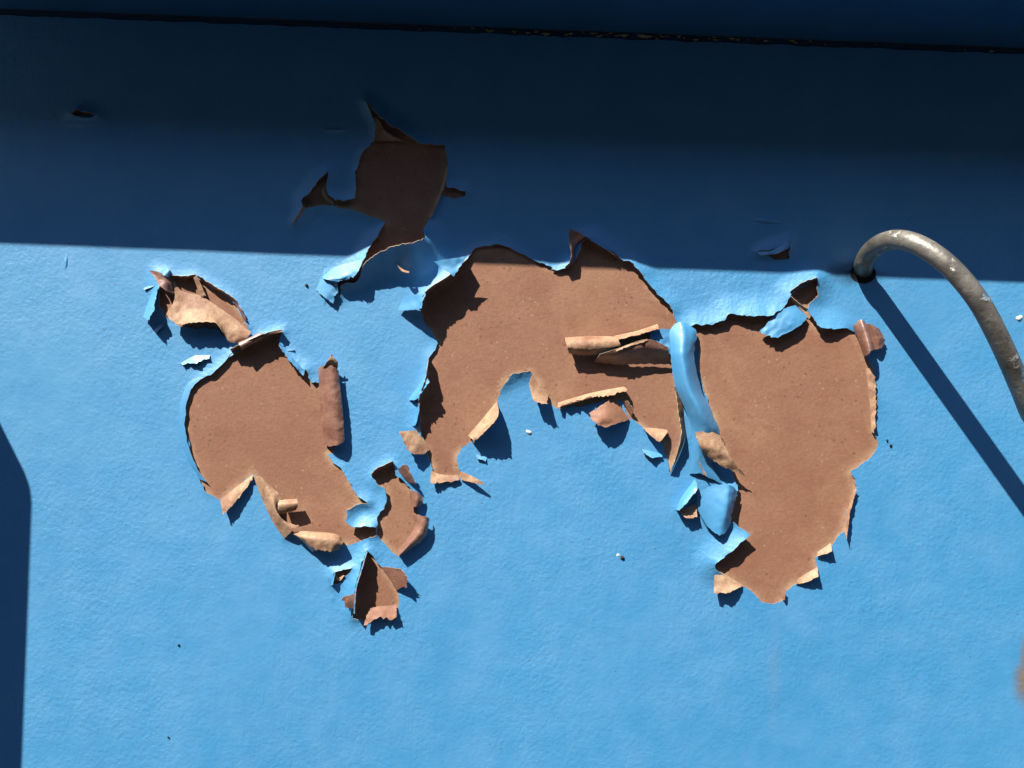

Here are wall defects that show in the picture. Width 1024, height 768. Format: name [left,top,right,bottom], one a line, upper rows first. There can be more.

peeling [292,101,466,303]
peeling [143,229,886,625]